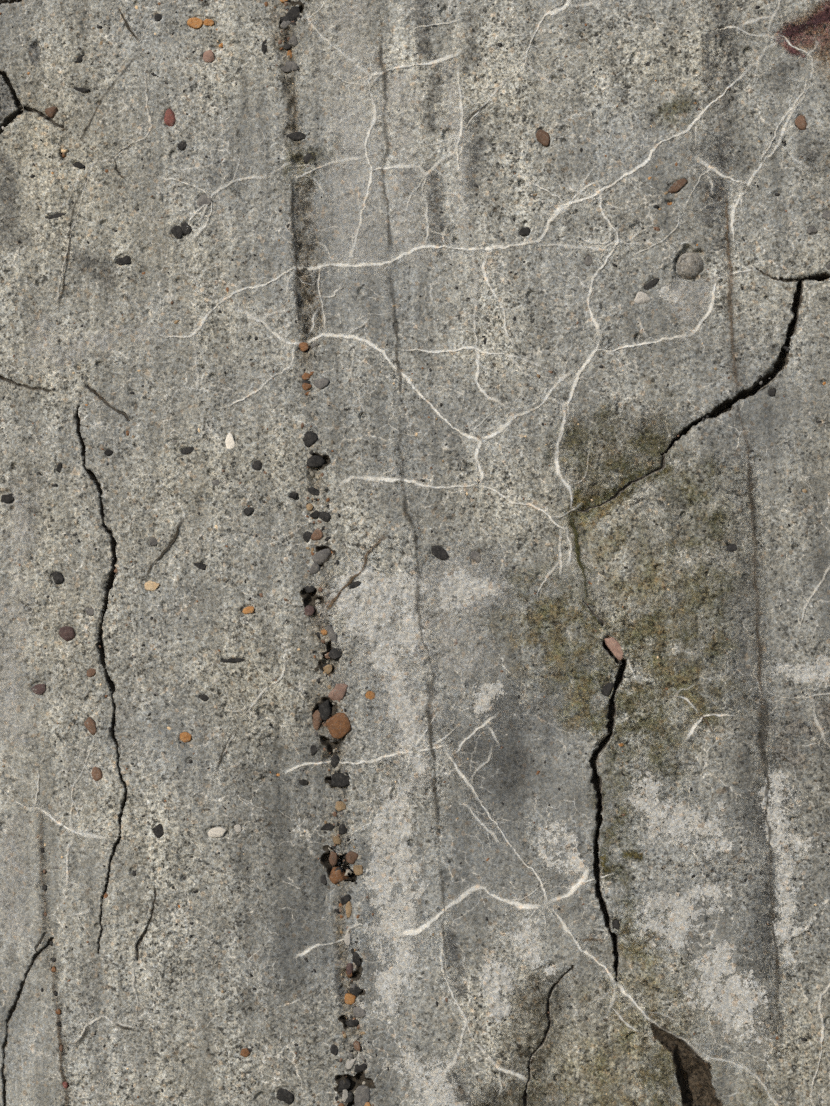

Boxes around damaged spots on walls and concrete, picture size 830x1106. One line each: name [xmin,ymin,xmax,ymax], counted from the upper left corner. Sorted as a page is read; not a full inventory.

crack [0,0,22,8]
corrosion [776,2,830,61]
crack [0,375,52,393]
crack [146,521,181,575]
crack [167,0,830,1106]
crack [0,386,129,954]
crack [1,932,54,1106]
crack [58,892,160,1078]
spalling [650,1022,723,1106]